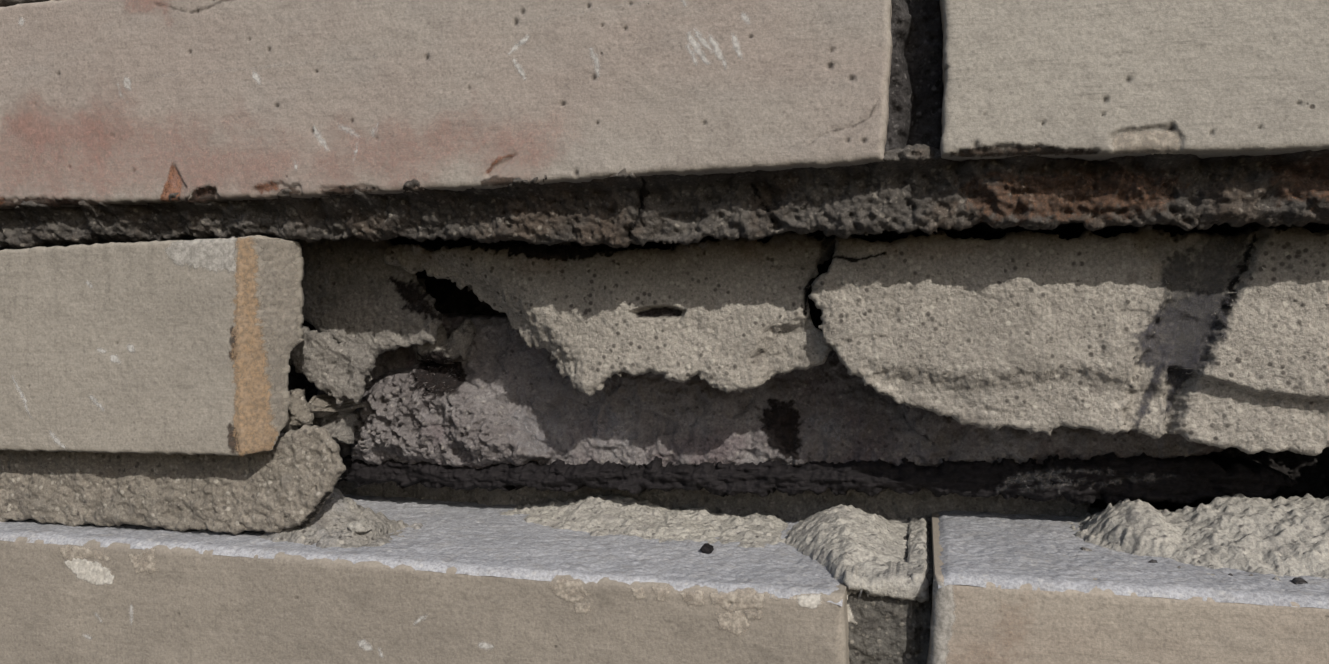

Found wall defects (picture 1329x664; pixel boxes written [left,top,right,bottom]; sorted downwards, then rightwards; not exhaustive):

crack [471,178,650,261]
crack [1250,224,1292,232]
crack [803,252,885,316]
leakage [1137,231,1256,428]
spalling [334,224,1329,523]